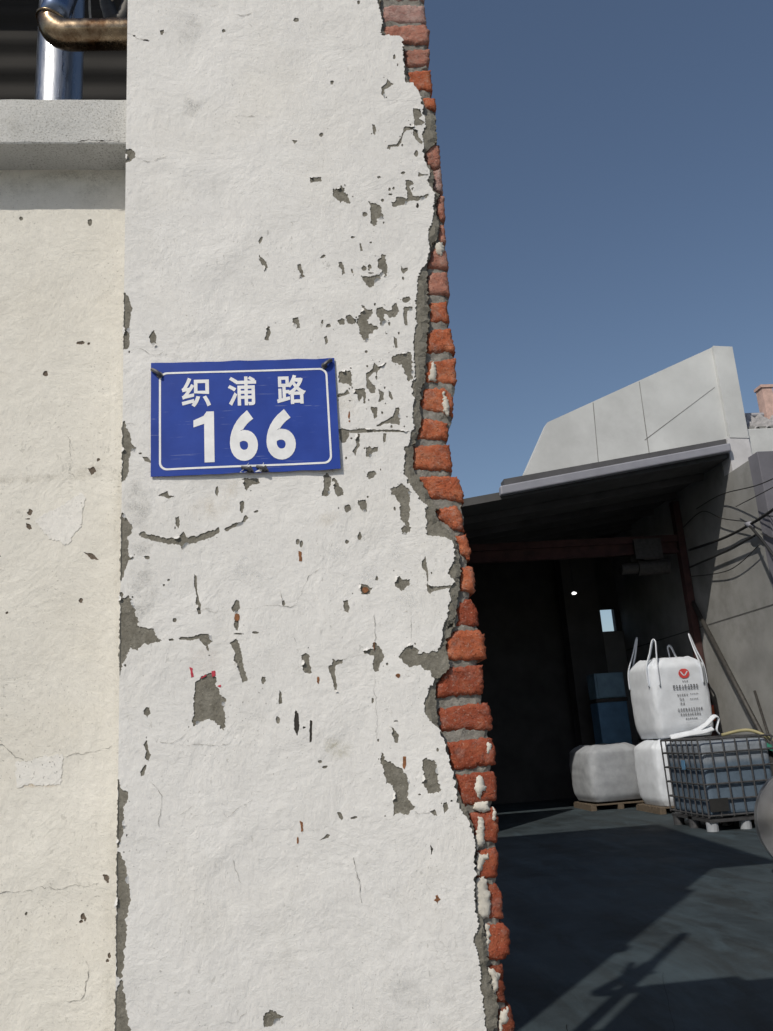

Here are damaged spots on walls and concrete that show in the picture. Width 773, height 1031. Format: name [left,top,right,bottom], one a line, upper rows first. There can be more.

peeling [118,478,260,682]
peeling [188,673,226,730]
flaking render [321,0,515,1031]
peeling [103,779,131,1031]